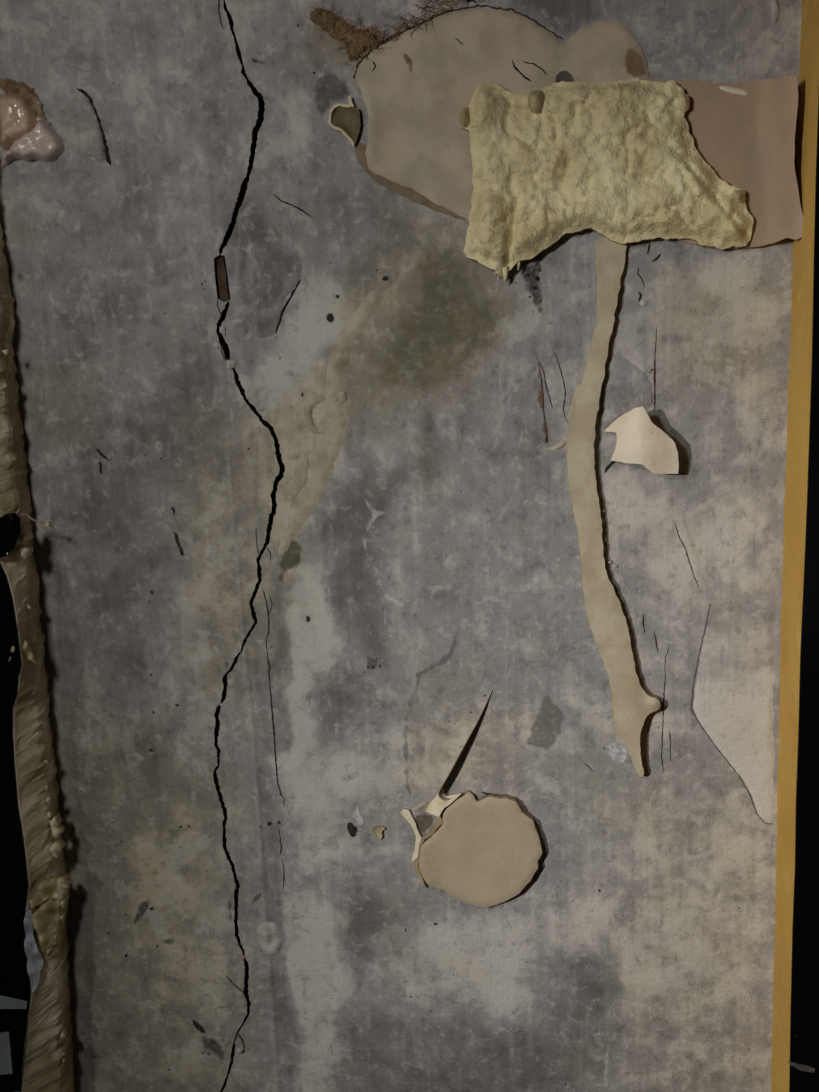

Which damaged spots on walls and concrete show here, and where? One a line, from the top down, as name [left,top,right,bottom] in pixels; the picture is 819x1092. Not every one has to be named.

peeling [316,76,361,147]
mould [516,261,541,312]
peeling [601,355,679,474]
crack [213,0,285,1092]
peeling [606,494,708,592]
peeling [690,599,775,825]